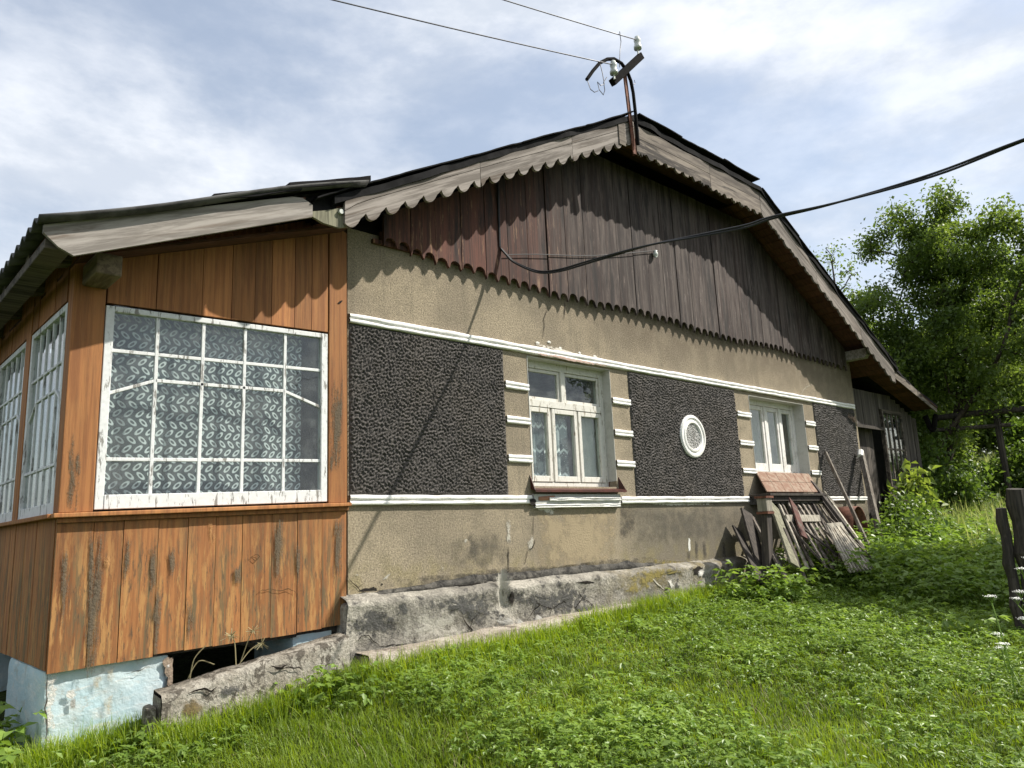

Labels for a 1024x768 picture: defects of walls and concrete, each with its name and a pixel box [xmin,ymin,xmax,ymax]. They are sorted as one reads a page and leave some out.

damp [423,522,617,585]
crack [529,593,594,618]
crack [272,663,302,671]
peeling [45,673,76,744]